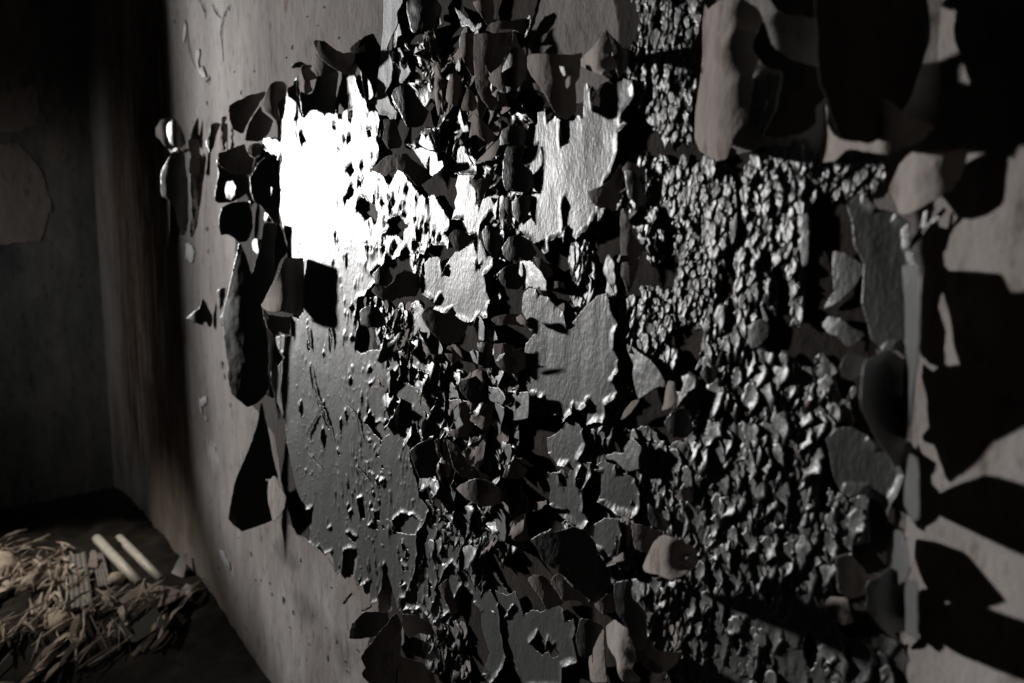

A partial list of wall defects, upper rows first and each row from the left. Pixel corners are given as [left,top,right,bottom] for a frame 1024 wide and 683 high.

peeling [156,0,968,683]